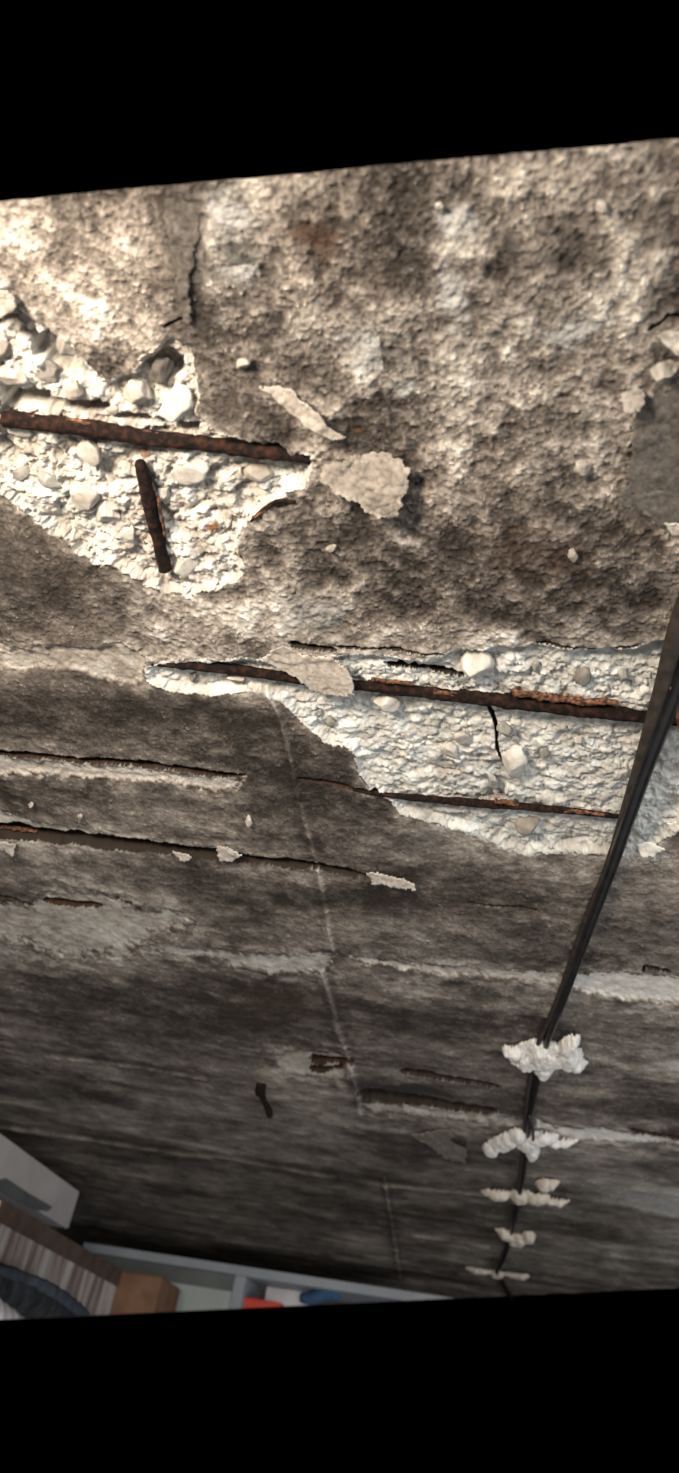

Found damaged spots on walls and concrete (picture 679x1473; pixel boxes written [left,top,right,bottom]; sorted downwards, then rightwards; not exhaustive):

spalling [0,289,411,600]
spalling [0,639,679,858]
crack [0,750,246,780]
flaking render [172,850,192,862]
crack [0,822,368,878]
flaking render [216,845,242,863]
crack [0,895,142,911]